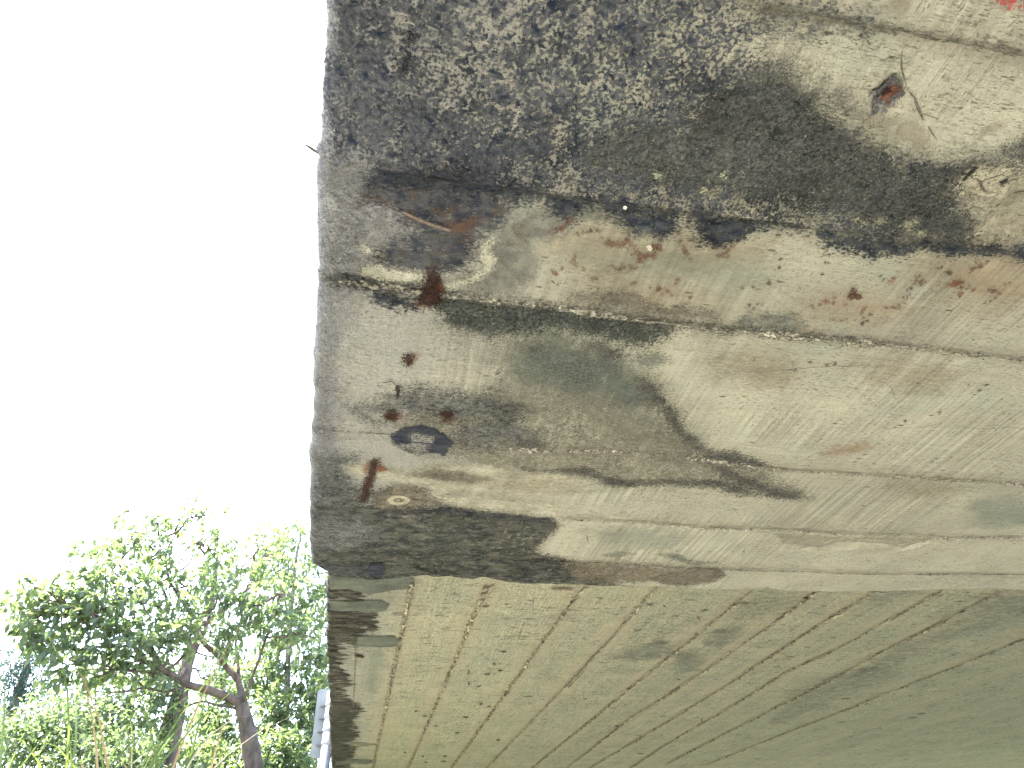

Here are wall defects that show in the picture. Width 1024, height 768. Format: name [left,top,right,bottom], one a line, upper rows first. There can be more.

rust [547,218,664,286]
rust [412,266,447,310]
rust [812,286,872,326]
rust [937,261,988,298]
rust [396,352,417,368]
water stain [307,0,1024,768]
rust [382,408,403,422]
rust [358,457,387,503]